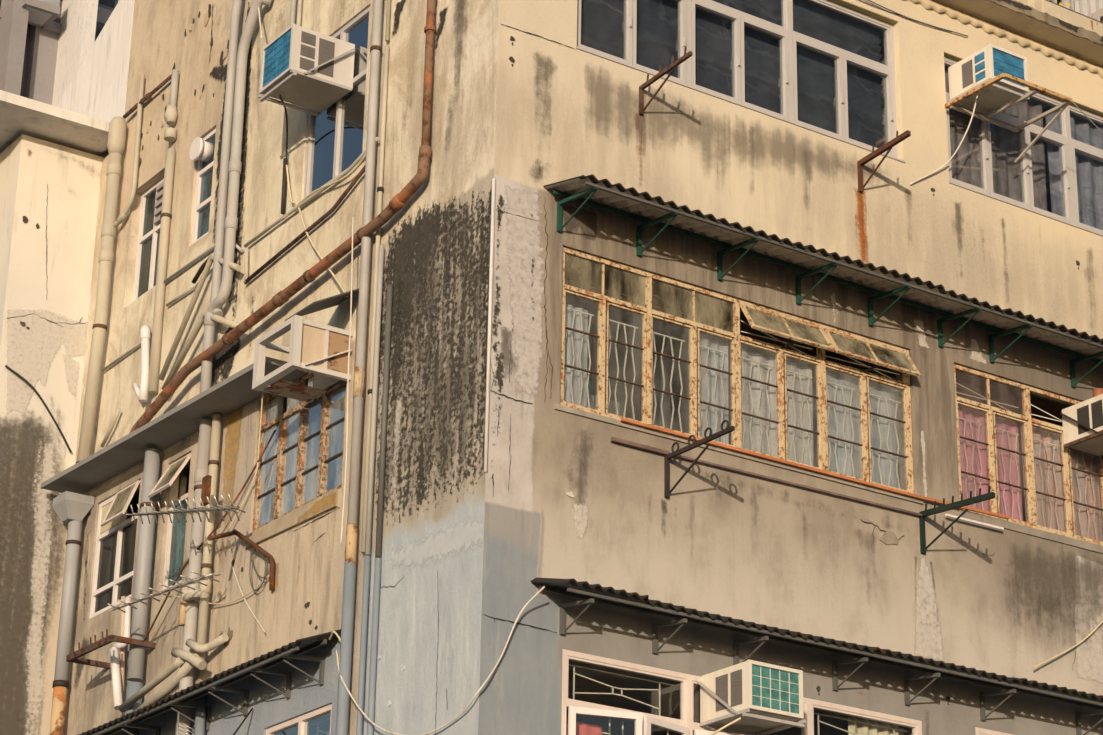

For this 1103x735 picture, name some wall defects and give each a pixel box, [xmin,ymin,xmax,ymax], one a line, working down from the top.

leakage [736,132,839,167]
crack [10,184,87,327]
rust [855,192,868,263]
leakage [375,189,514,523]
peeling [565,492,588,538]
leakage [0,417,64,735]
leakage [1015,554,1103,614]